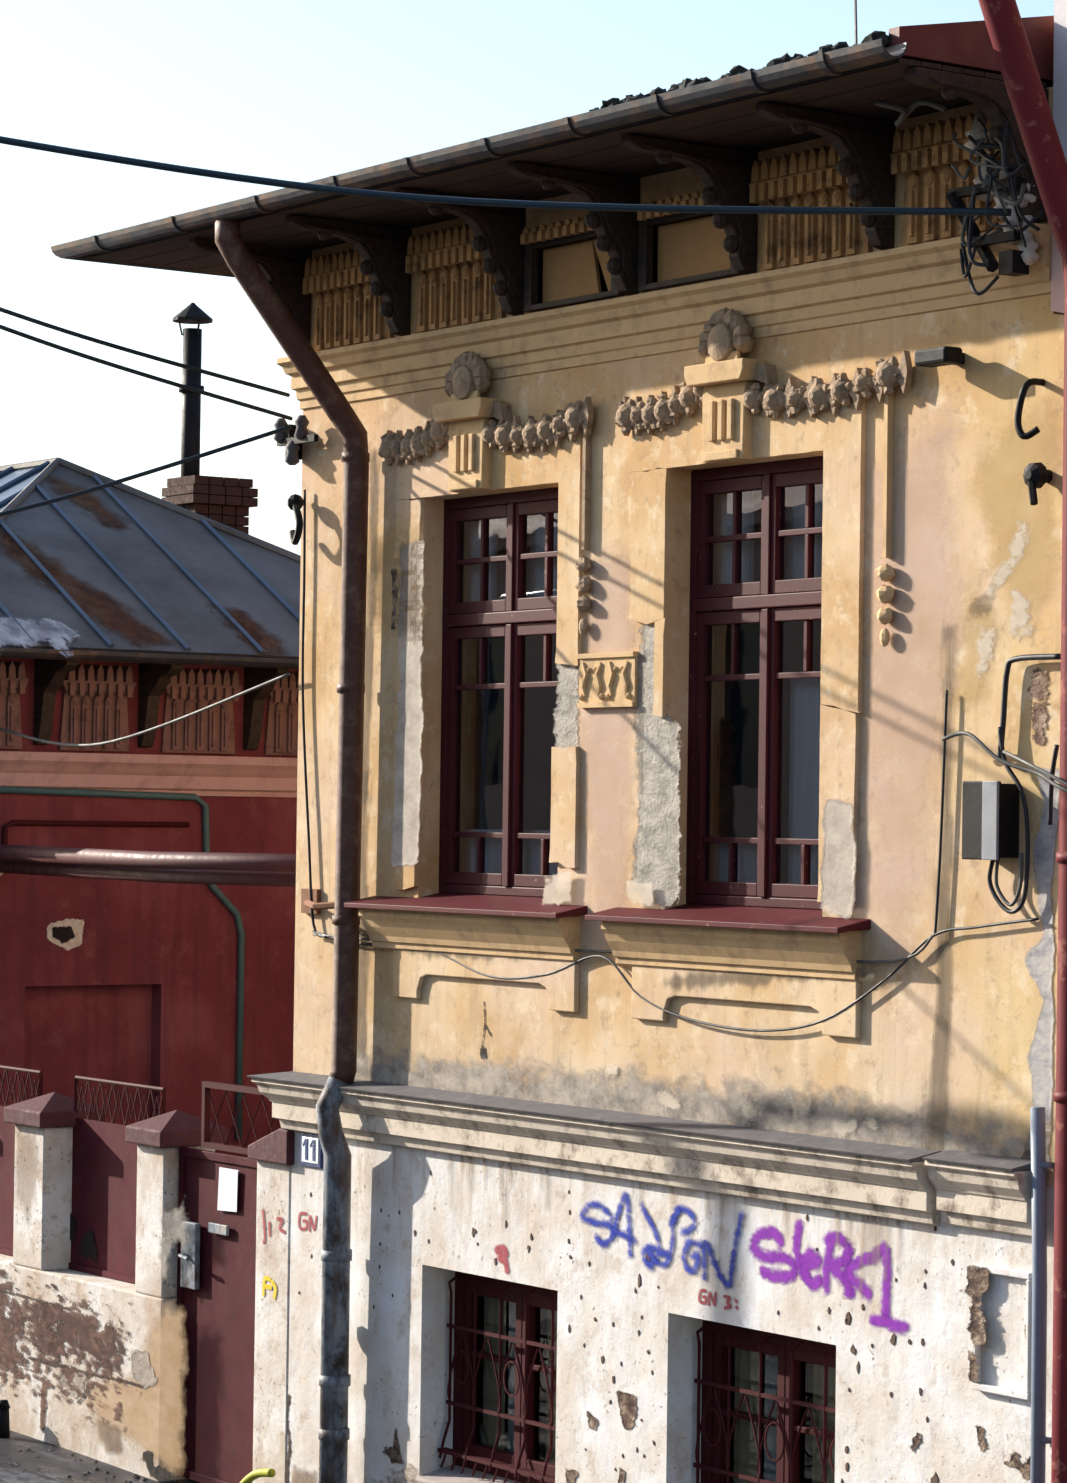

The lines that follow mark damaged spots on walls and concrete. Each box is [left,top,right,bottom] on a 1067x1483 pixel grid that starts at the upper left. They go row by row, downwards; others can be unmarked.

corrosion [47,476,126,528]
corrosion [0,530,170,646]
damp [360,452,377,899]
spalling [553,663,579,748]
spalling [626,624,682,908]
peeling [543,871,571,905]
damp [355,734,1031,1160]
spalling [820,799,856,918]
peeling [0,1264,157,1433]
spalling [601,1356,643,1430]
spalling [950,1259,990,1384]
spalling [1004,1451,1031,1480]